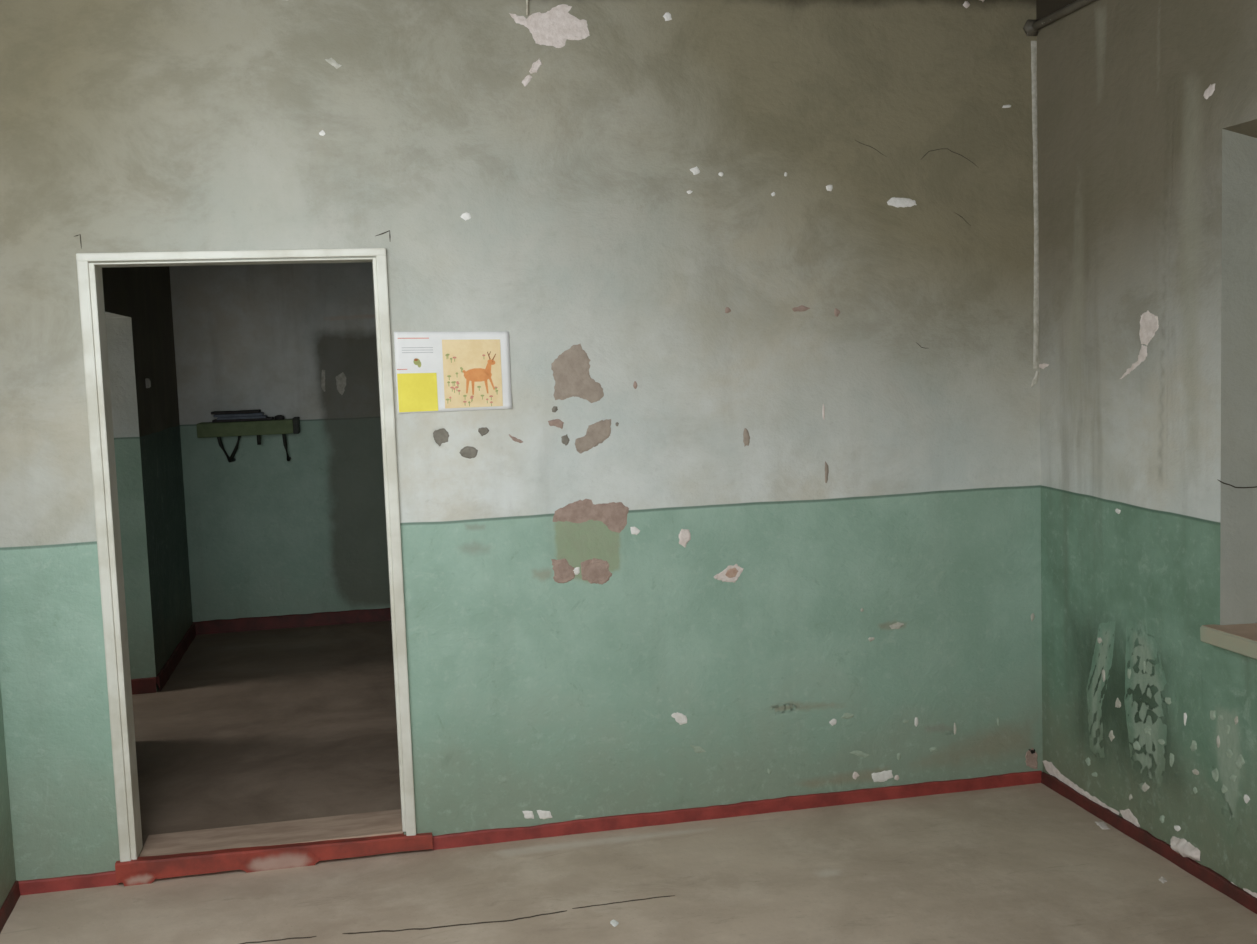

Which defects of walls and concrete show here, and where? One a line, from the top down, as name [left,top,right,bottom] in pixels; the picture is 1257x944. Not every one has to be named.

spalling [509,4,590,86]
peeling [1120,311,1159,379]
spalling [548,343,619,454]
spalling [714,564,744,583]
damp [770,572,1249,856]
spalling [1025,748,1149,827]
damp [1052,790,1171,888]
spalling [1159,815,1200,861]